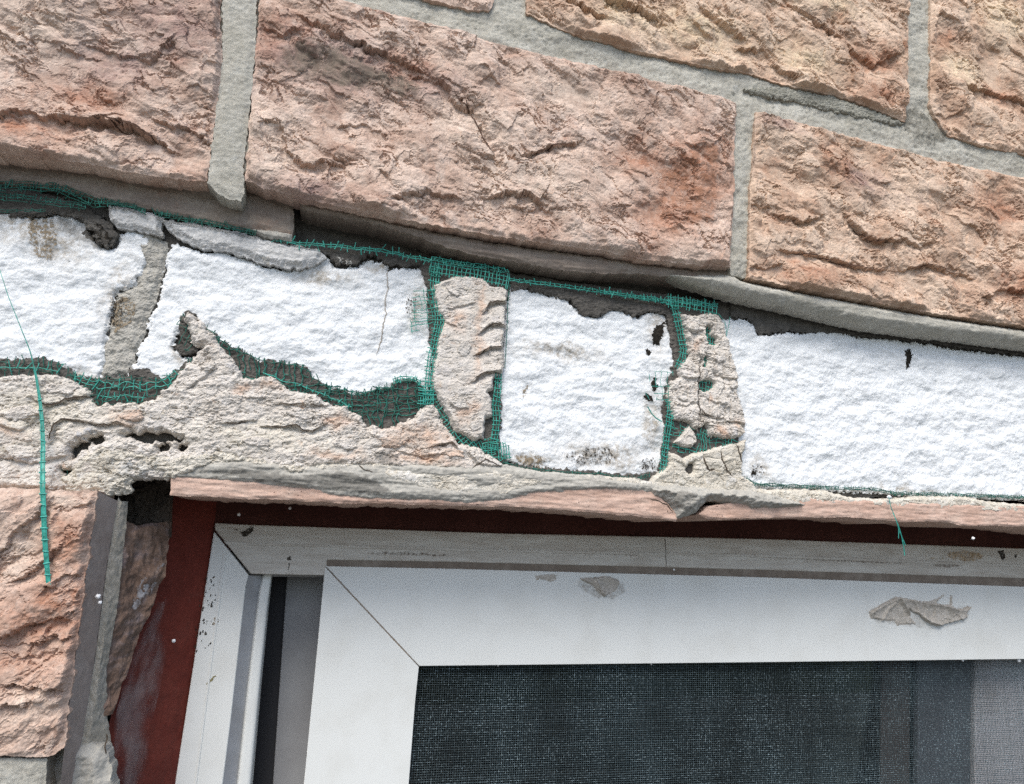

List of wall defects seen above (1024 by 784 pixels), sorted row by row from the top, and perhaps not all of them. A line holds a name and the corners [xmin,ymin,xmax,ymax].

spalling [0,179,257,250]
crack [377,266,389,352]
spalling [0,236,1024,538]